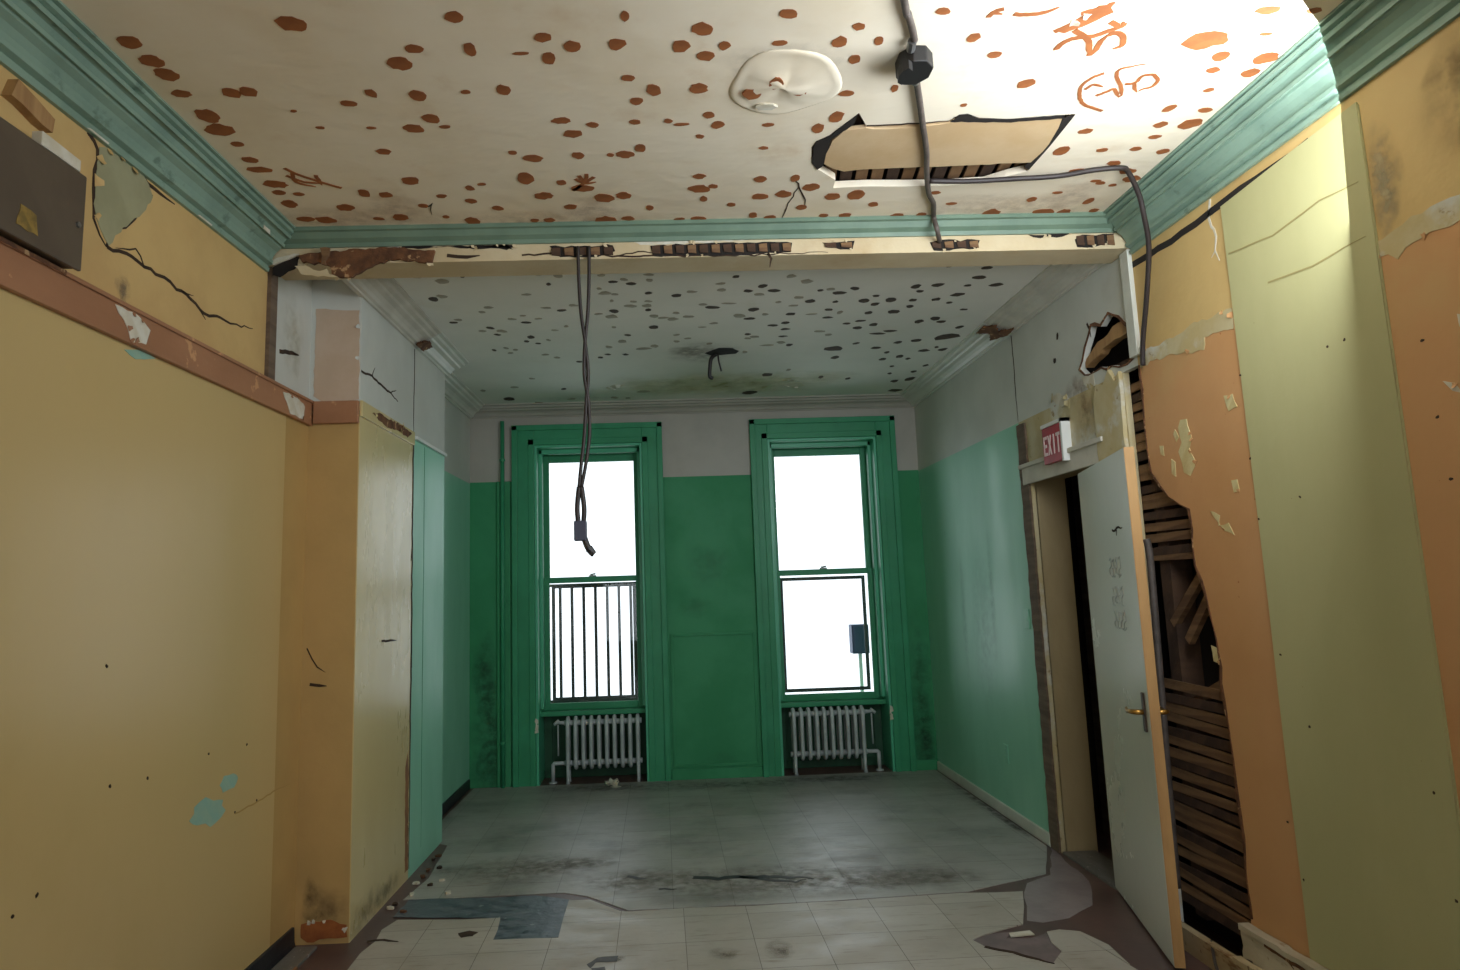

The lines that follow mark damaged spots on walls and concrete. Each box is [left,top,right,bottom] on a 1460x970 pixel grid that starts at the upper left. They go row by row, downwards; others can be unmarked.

peeling [116,36,504,224]
peeling [621,75,661,125]
peeling [664,112,725,139]
peeling [689,83,708,94]
peeling [811,90,854,133]
peeling [508,117,654,222]
peeling [674,173,718,220]
peeling [727,175,927,218]
crack [87,132,299,356]
flaking render [295,244,518,302]
flaking render [479,239,1004,392]
flaking render [1078,308,1234,390]